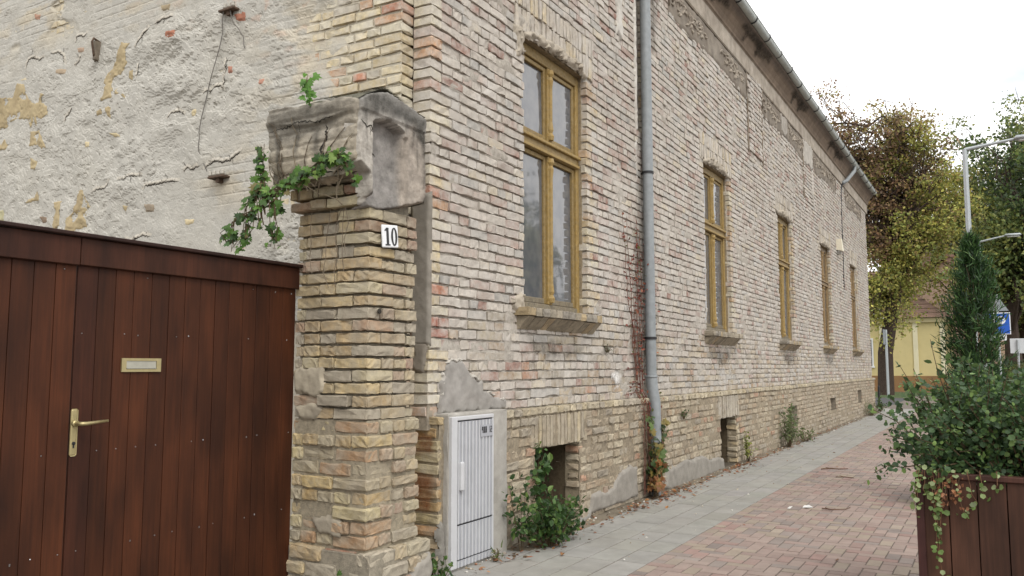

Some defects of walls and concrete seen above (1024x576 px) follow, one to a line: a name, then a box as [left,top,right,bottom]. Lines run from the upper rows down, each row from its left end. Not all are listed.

peeling [96,42,133,117]
peeling [0,83,48,170]
crack [91,147,242,192]
crack [270,116,343,173]
peeling [40,190,91,231]